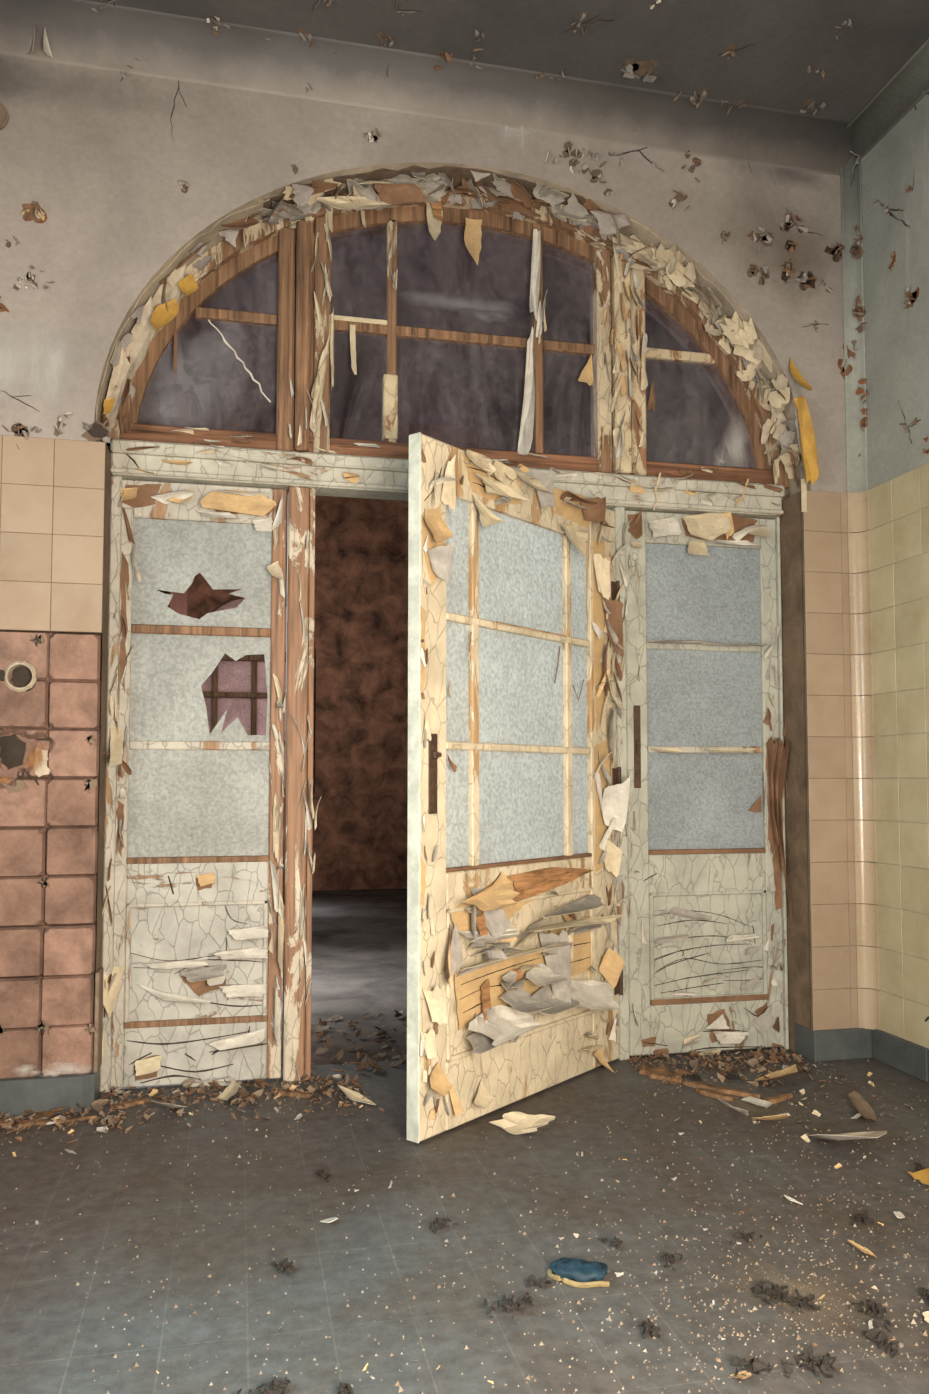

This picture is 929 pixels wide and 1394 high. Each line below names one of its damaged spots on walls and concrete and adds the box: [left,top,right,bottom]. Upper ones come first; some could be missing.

peeling [206,16,231,36]
peeling [618,59,659,83]
peeling [362,128,381,143]
peeling [747,210,864,293]
peeling [903,286,920,309]
peeling [837,295,869,431]
spalling [0,141,819,1119]